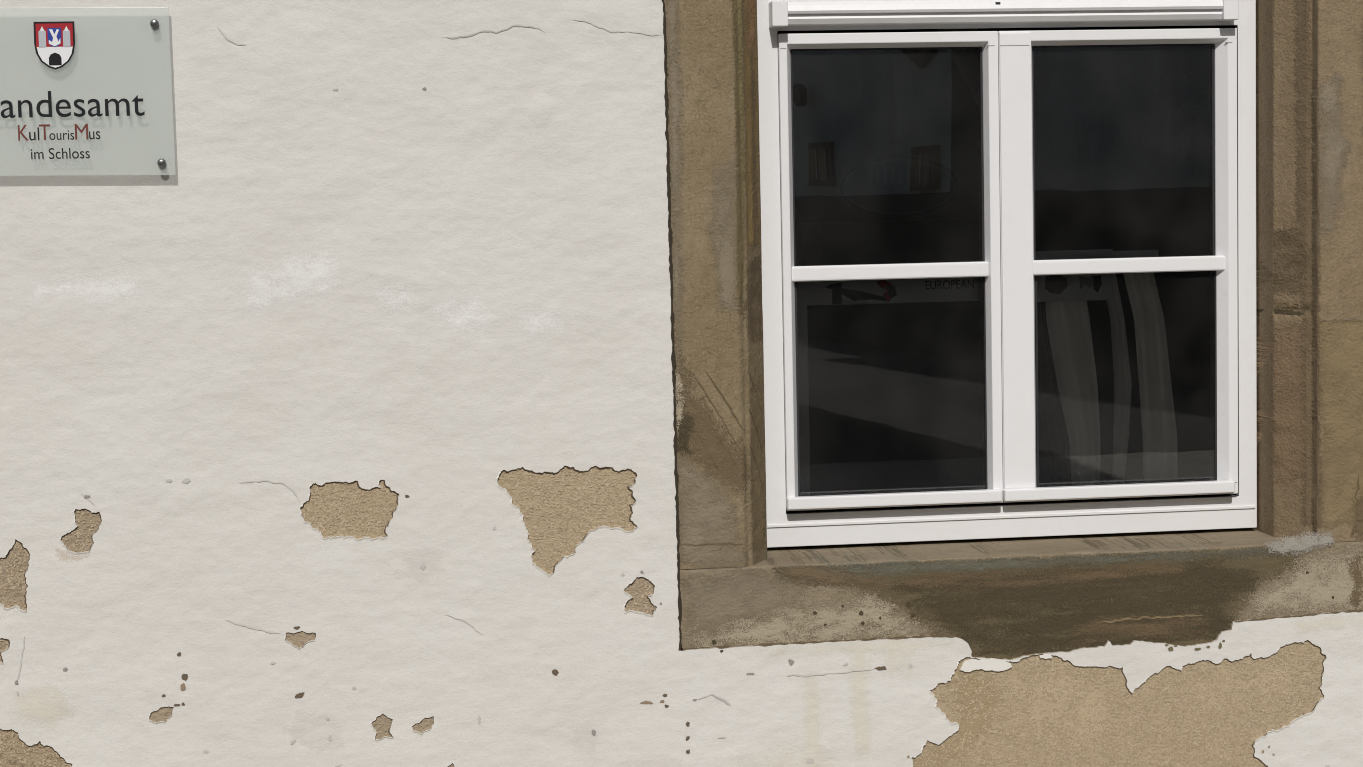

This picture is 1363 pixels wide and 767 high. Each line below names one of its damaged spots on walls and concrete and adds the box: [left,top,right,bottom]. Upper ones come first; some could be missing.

water stain [623,0,1363,767]
flaking render [59,495,102,555]
flaking render [299,480,409,541]
flaking render [496,466,638,577]
flaking render [0,540,30,613]
flaking render [621,571,662,617]
flaking render [0,638,10,665]
flaking render [284,626,316,650]
flaking render [907,640,1327,767]
flaking render [0,729,72,767]